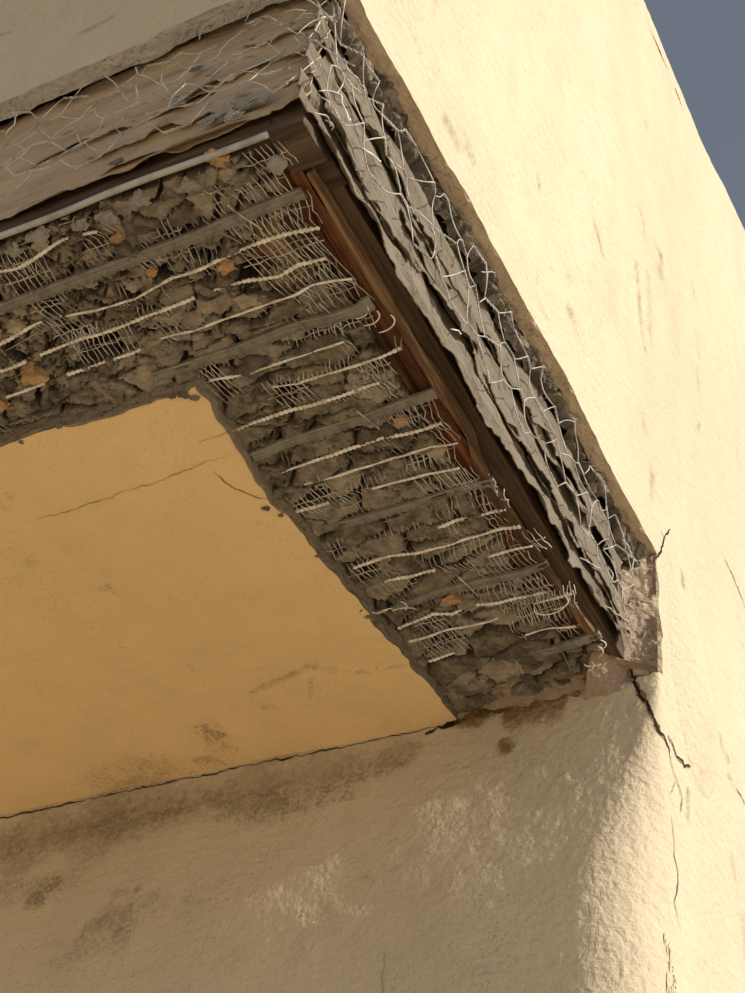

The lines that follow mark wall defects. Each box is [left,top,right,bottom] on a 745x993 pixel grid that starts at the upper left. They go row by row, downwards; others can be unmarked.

crack [28,428,263,522]
spalling [0,0,663,735]
crack [652,529,671,563]
crack [627,669,691,929]